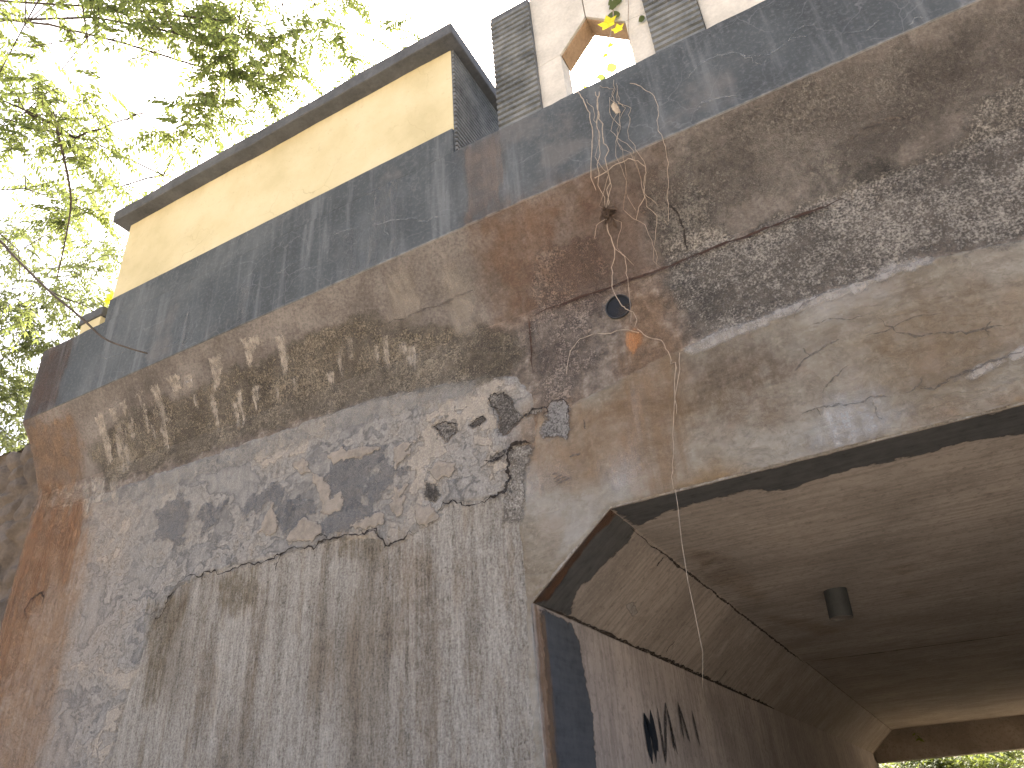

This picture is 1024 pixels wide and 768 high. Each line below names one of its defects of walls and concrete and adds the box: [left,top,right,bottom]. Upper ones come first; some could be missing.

crack [528,197,845,369]
flaking render [154,495,227,549]
leakage [43,273,525,520]
flaking render [240,434,456,543]
spalling [433,392,521,444]
crack [438,406,547,511]
spalling [486,443,532,523]
crack [804,365,885,419]
crack [795,290,1022,392]
crack [154,527,419,622]
crack [631,528,1014,663]
crack [544,606,774,709]